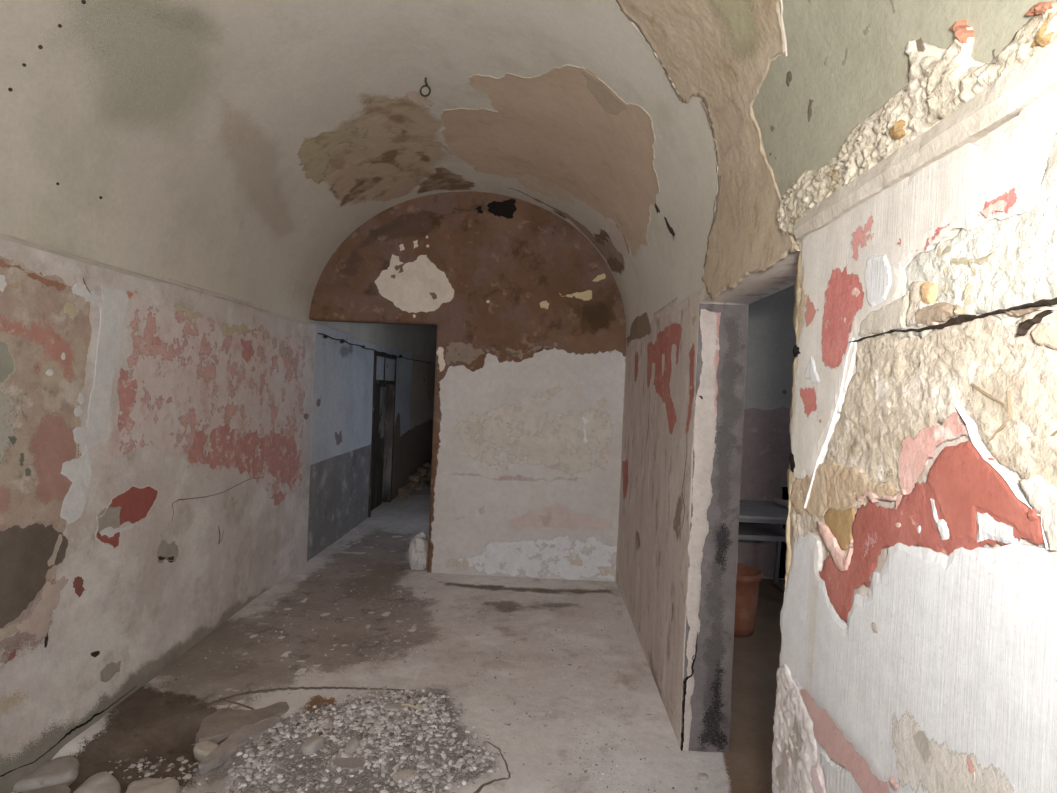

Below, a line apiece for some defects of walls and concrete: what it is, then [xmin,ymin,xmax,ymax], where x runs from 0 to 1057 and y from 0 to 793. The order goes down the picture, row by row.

flaking render [440,64,675,258]
peeling [0,255,103,664]
peeling [100,290,321,506]
flaking render [614,0,1057,622]
crack [848,297,1057,343]
crack [0,686,136,777]
flaking render [781,674,1014,793]